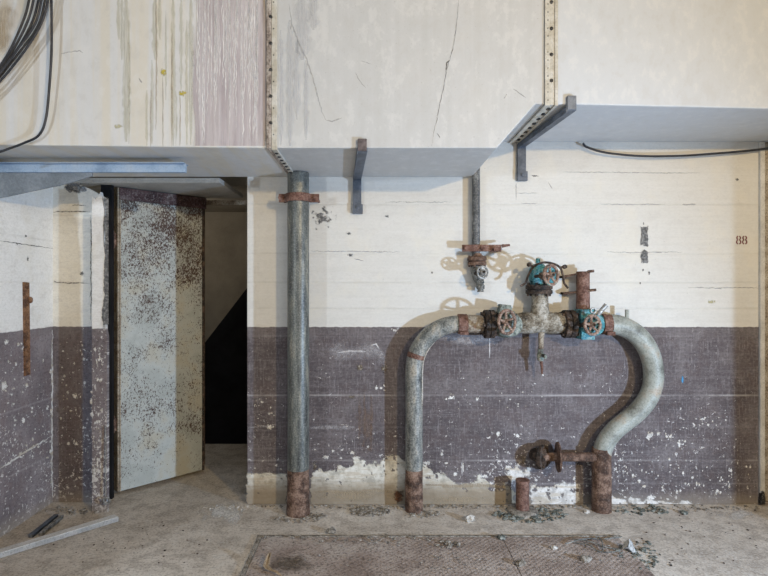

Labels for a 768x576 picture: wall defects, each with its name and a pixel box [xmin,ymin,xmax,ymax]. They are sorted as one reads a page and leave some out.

peeling [309,450,405,504]
peeling [423,452,580,504]